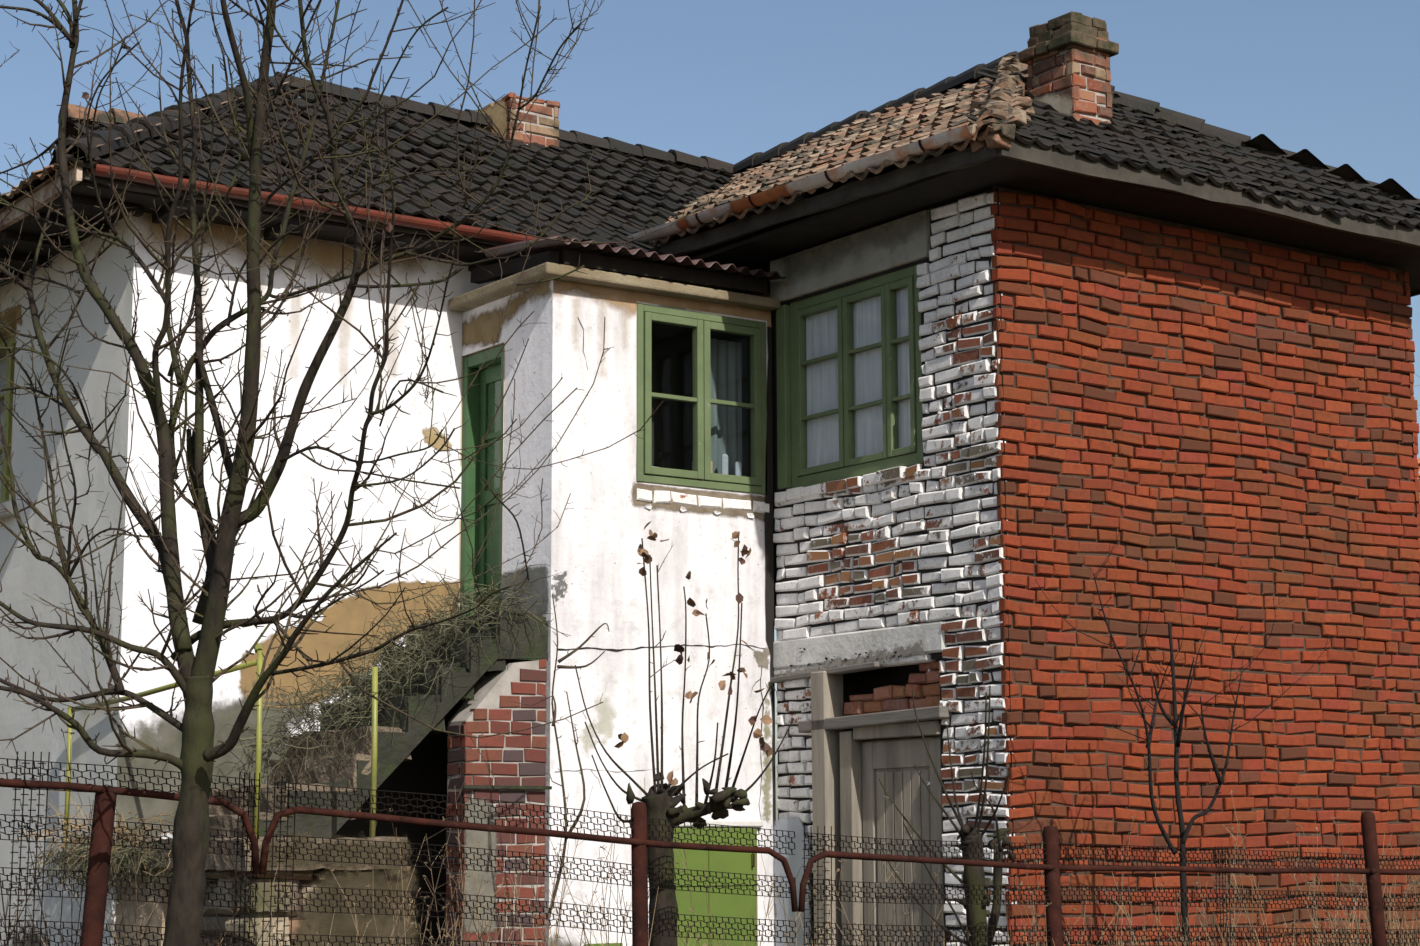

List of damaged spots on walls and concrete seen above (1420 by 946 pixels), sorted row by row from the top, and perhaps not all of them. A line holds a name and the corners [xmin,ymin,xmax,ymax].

peeling [876,309,998,494]
peeling [423,427,452,450]
peeling [822,477,860,506]
peeling [916,509,947,539]
peeling [973,523,1001,562]
peeling [807,520,927,614]
peeling [773,607,1006,844]